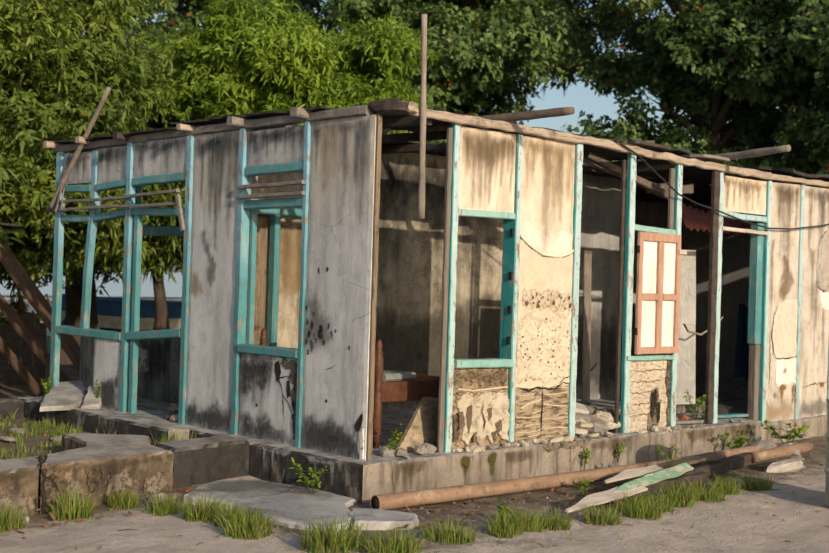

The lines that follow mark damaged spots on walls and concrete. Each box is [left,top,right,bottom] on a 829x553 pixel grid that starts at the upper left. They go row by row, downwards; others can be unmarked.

leakage [381,163,446,289]
peeling [816,229,829,310]
leakage [186,404,231,431]
leakage [241,354,272,393]
leakage [240,415,290,463]
crack [274,359,293,424]
leakage [302,418,359,474]
peeling [453,392,510,446]
peeling [516,235,574,387]
spalling [647,360,671,430]
peeling [771,299,798,388]
crack [35,455,59,514]